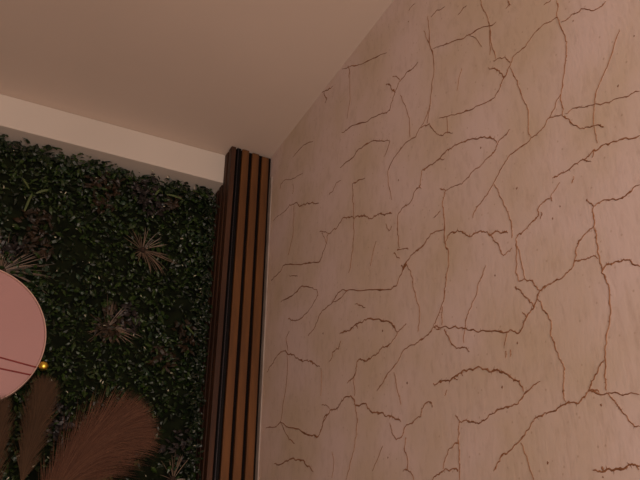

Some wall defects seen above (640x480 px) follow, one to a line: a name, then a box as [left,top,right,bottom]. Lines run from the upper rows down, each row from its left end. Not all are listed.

crack [266,0,640,480]